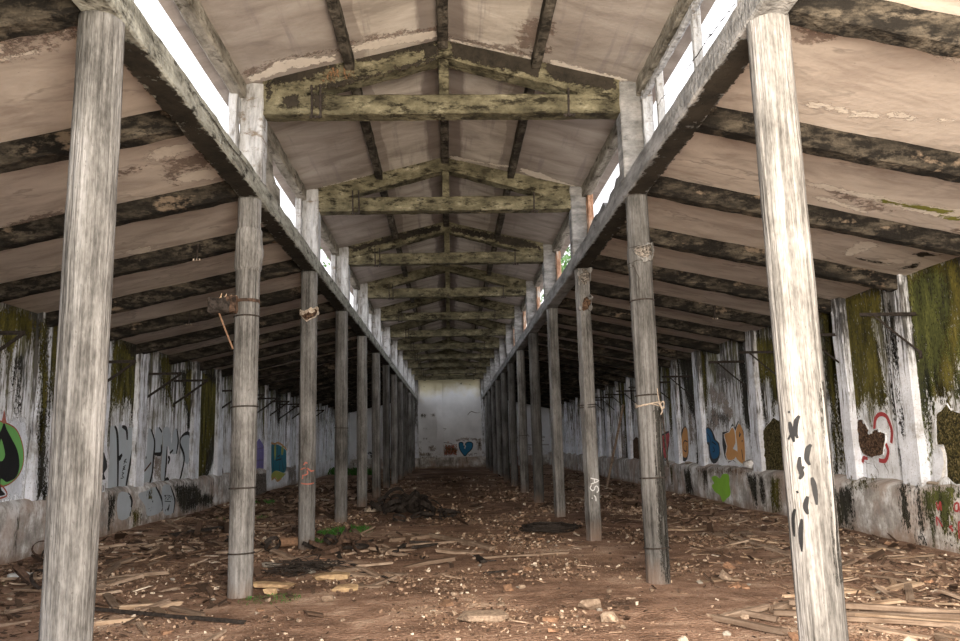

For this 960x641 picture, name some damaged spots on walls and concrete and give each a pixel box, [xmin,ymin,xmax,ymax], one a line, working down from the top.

leakage [244,19,628,110]
leakage [794,27,835,43]
leakage [520,168,574,186]
leakage [845,241,943,286]
leakage [856,290,906,436]
leakage [0,322,58,501]
spalling [857,418,887,459]
spalling [931,403,960,485]
leakage [896,483,960,552]